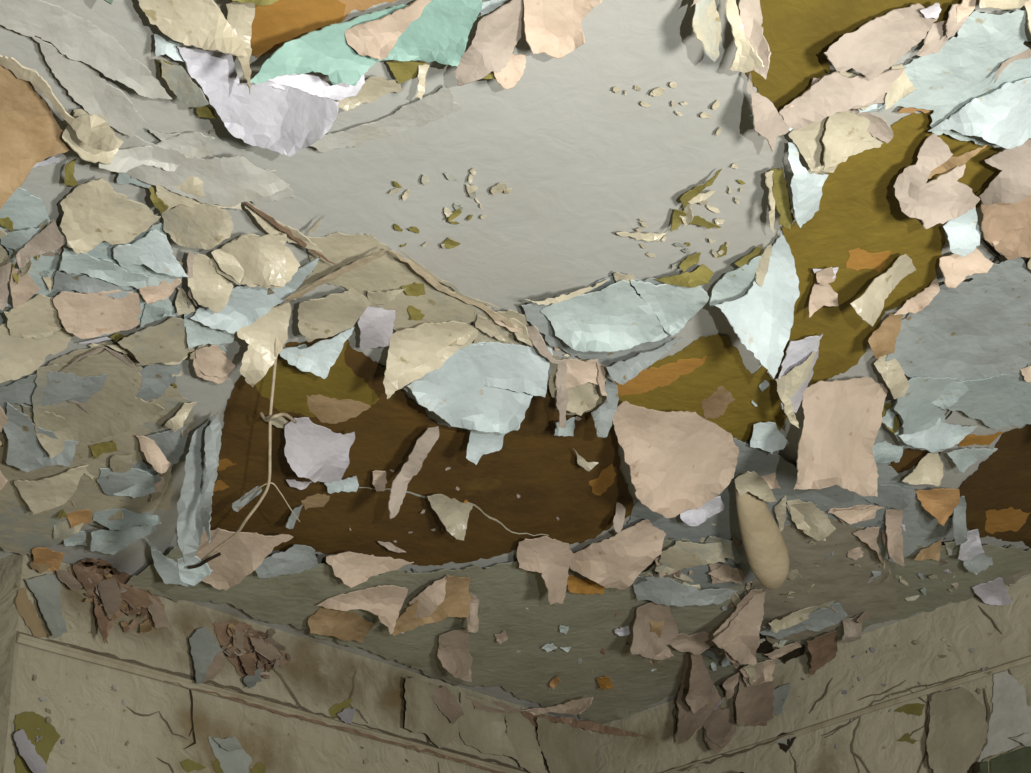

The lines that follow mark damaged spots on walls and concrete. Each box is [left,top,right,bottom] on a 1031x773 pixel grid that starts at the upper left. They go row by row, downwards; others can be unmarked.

peeling [0,0,172,209]
peeling [138,0,603,157]
peeling [692,0,722,62]
peeling [725,0,1031,434]
peeling [0,126,744,755]
peeling [473,153,1031,632]
peeling [13,712,60,773]
spalling [776,732,796,753]
crack [809,678,833,713]
peeling [630,544,1031,726]
crack [821,667,988,773]
spalling [967,671,1031,773]